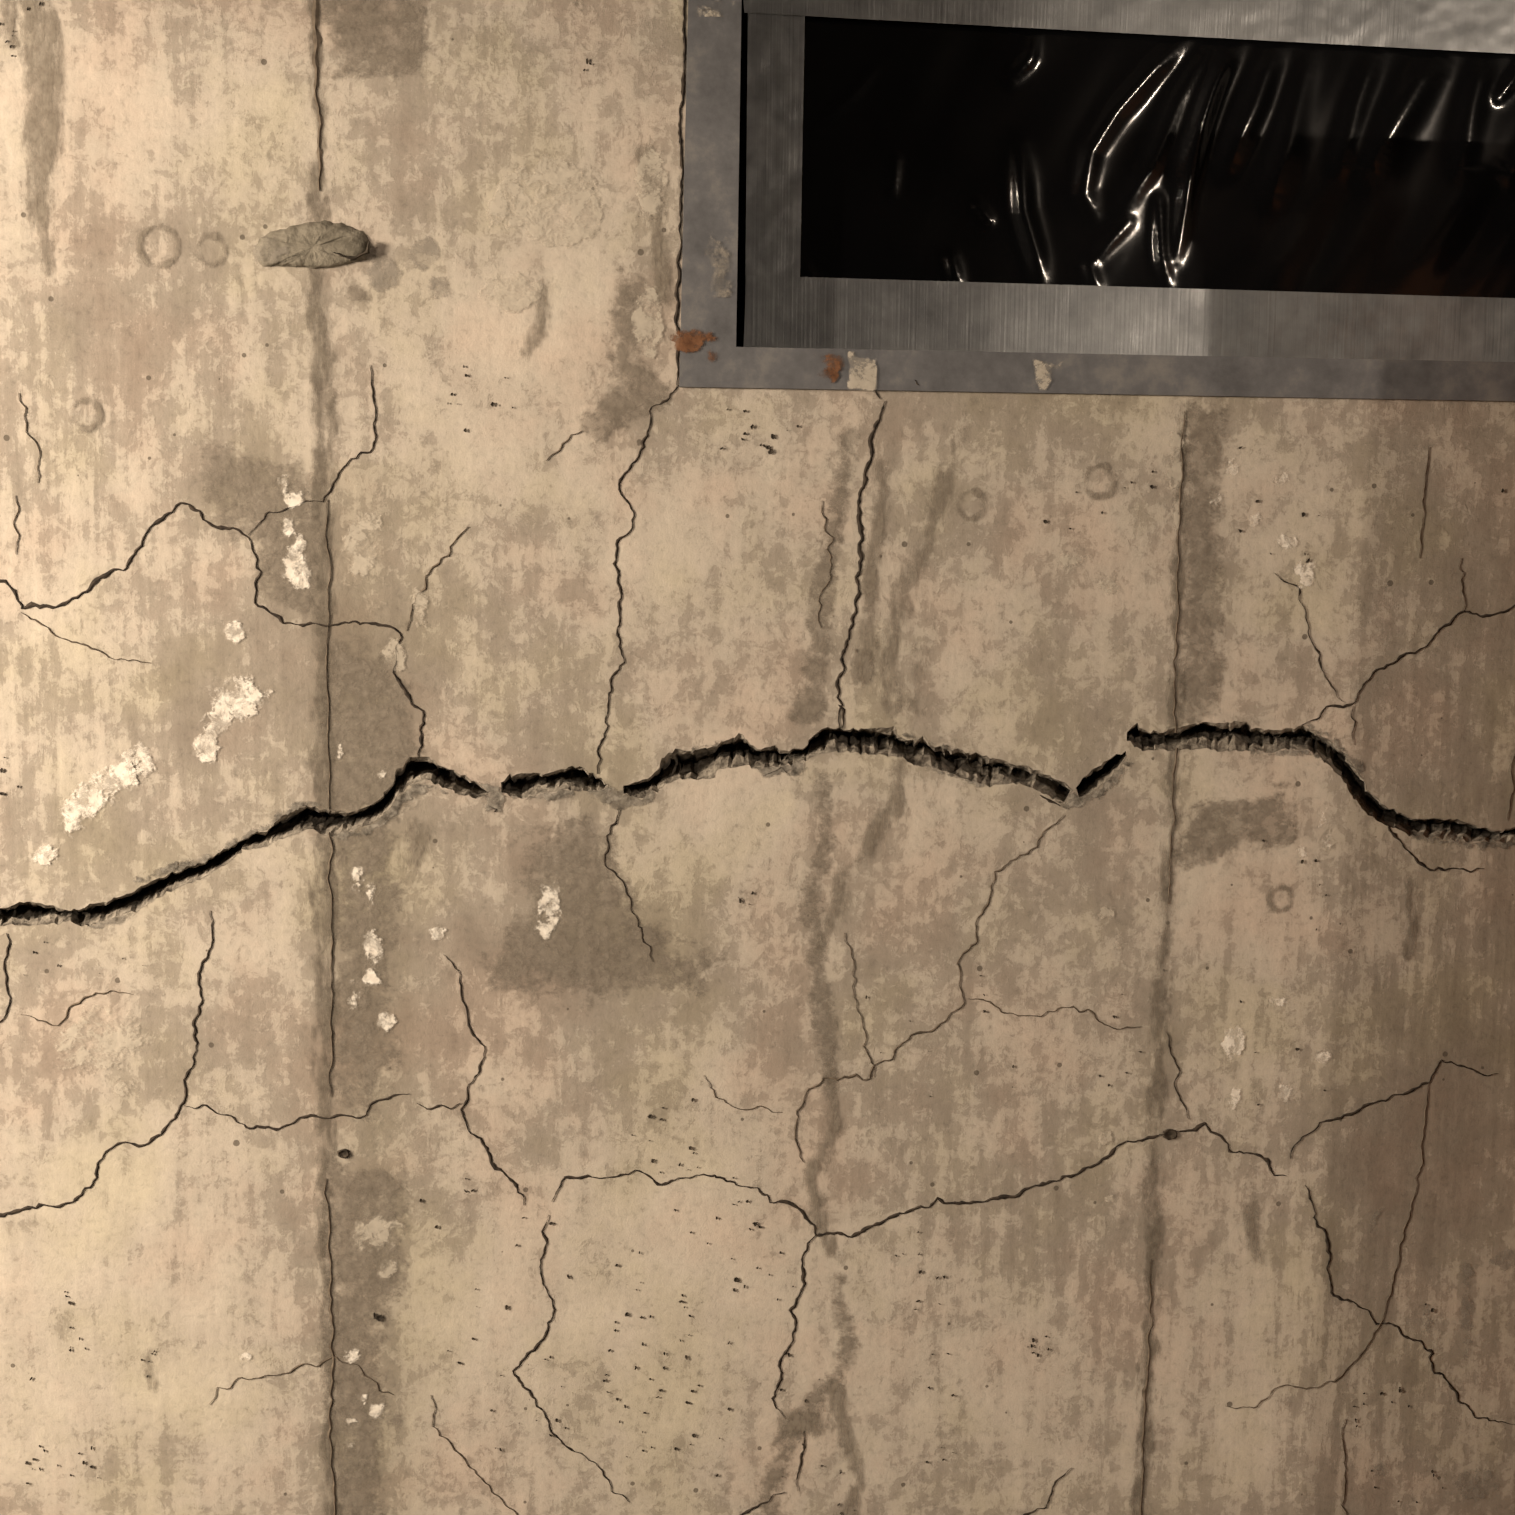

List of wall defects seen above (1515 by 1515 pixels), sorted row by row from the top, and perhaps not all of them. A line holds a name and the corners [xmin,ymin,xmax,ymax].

water stain [320,0,427,77]
crack [0,0,1515,1161]
water stain [490,816,709,994]
crack [0,916,1515,1515]